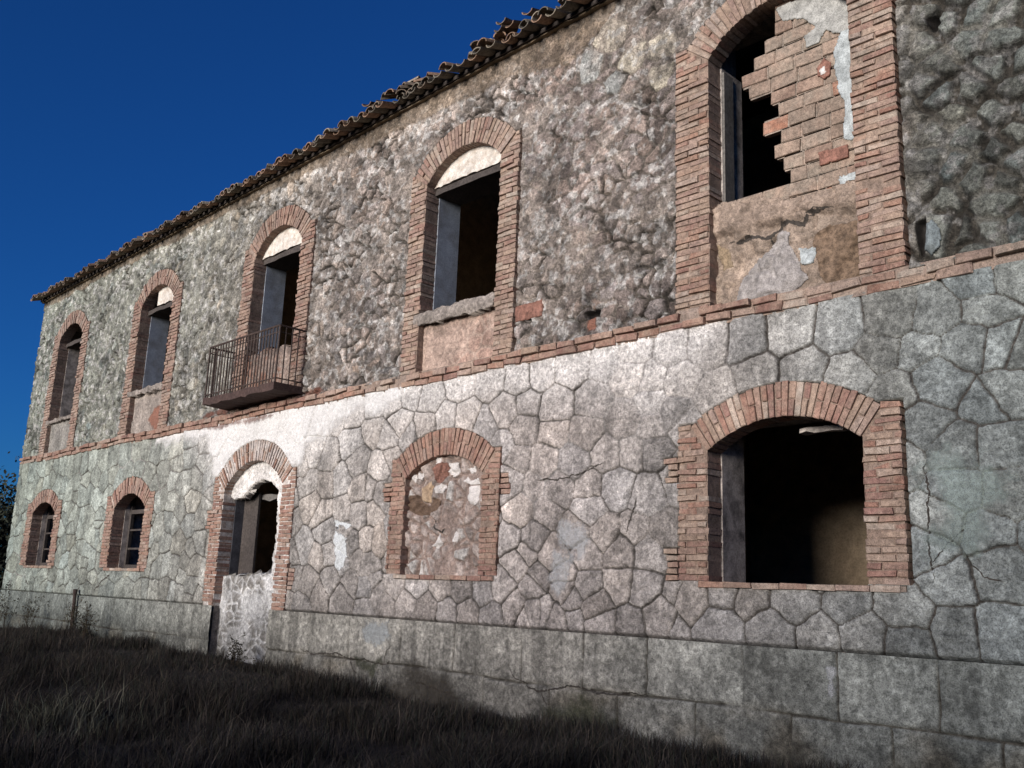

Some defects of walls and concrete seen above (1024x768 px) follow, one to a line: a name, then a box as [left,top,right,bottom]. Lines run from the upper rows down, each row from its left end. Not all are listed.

flaking render [776,0,854,166]
crack [731,206,834,245]
flaking render [838,172,856,184]
crack [922,460,1006,582]